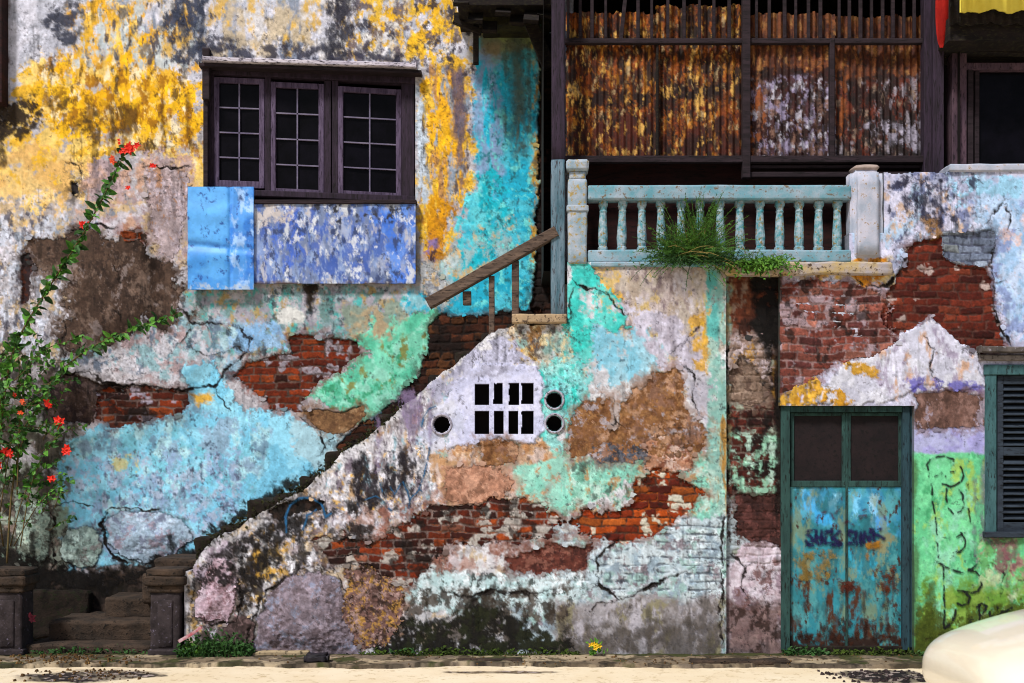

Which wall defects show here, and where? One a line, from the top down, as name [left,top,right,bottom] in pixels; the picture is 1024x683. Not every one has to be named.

leakage [43,0,78,49]
crack [568,281,625,320]
flaking render [726,228,1006,394]
flaking render [92,385,190,428]
crack [60,306,253,409]
flaking render [233,333,360,412]
flaking render [312,365,708,587]
crack [14,493,160,570]
leakage [373,593,723,655]
crack [589,539,694,612]
corrosion [798,550,901,646]